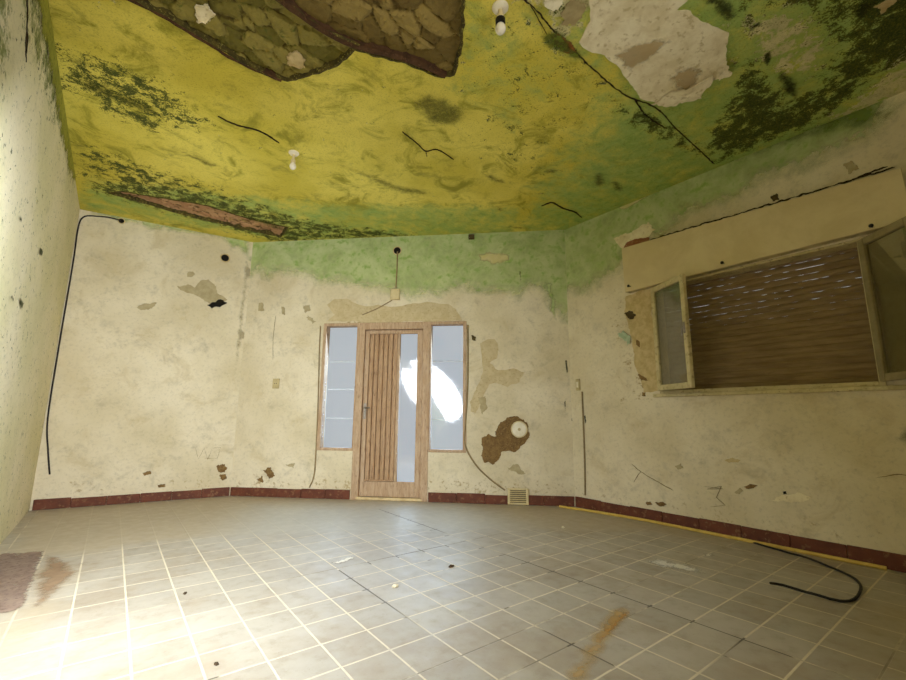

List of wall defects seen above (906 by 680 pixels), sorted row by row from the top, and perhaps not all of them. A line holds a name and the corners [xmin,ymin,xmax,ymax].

crack [524,0,557,34]
damp [708,0,733,20]
peeling [544,0,732,107]
crack [218,116,279,143]
crack [579,55,714,164]
damp [779,74,796,96]
damp [226,99,882,313]
crack [650,166,894,240]
peeling [177,272,227,308]
peeling [470,335,525,414]
flaking render [481,416,530,465]
damp [0,551,73,613]